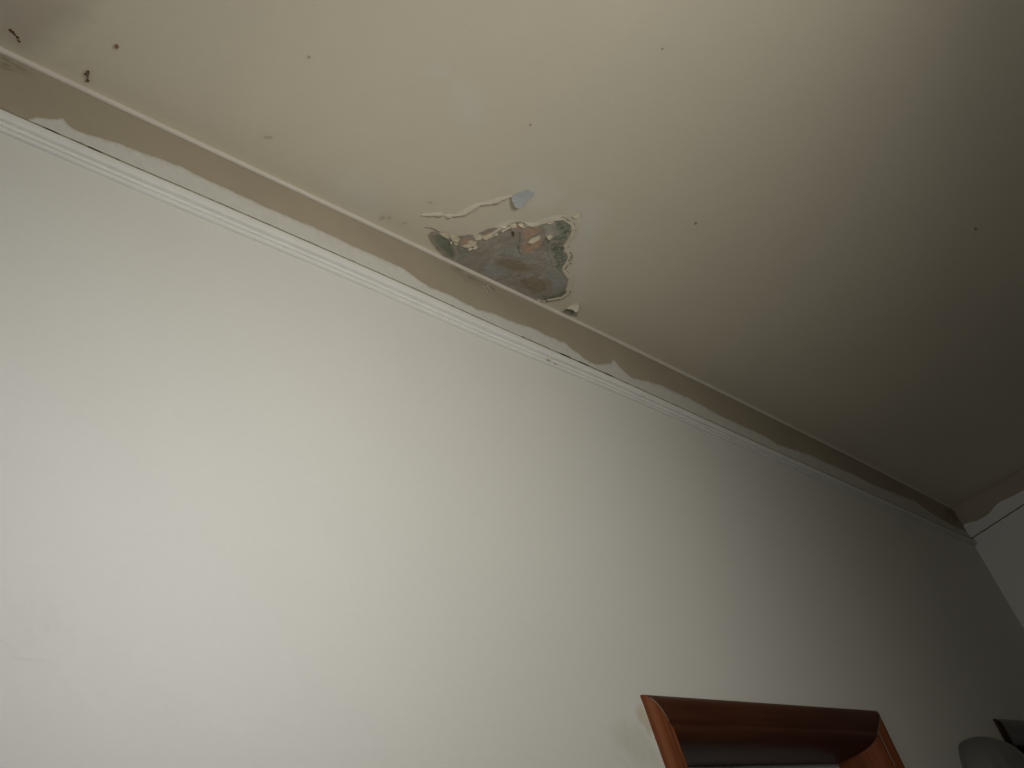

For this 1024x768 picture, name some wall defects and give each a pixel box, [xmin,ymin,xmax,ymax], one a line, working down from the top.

peeling [25,115,971,539]